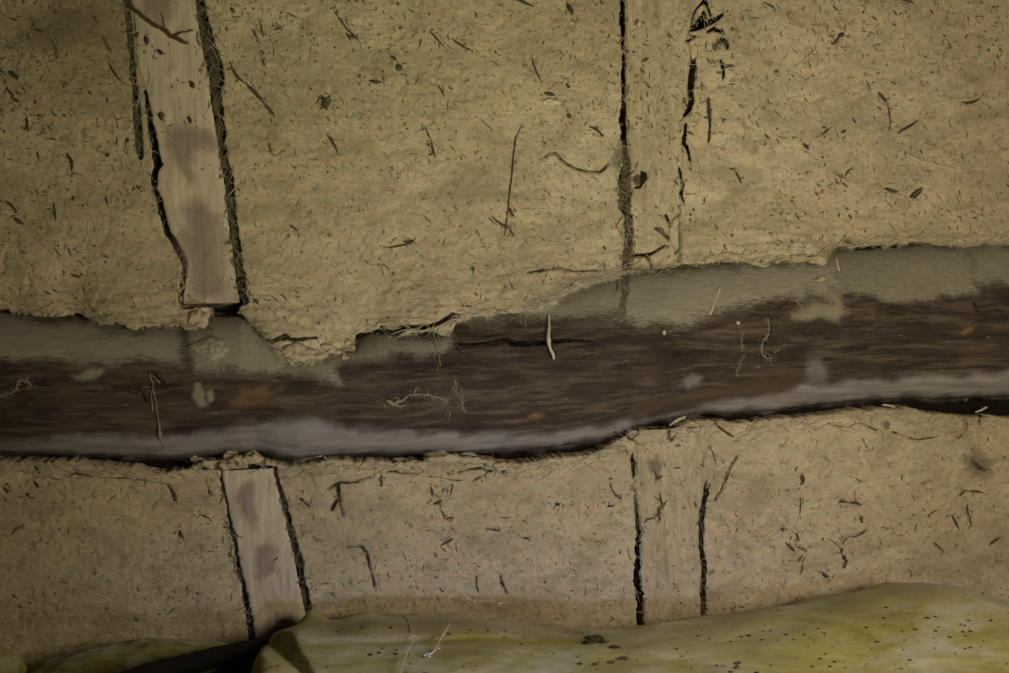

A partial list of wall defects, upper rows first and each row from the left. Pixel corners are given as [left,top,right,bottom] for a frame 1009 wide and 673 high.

peeling [230,62,275,118]
crack [528,0,734,321]
crack [145,91,189,302]
peeling [884,187,923,198]
spalling [722,251,828,282]
spalling [263,332,356,367]
spalling [381,314,459,338]
spalling [632,428,669,446]
crack [624,449,647,625]
crack [697,455,739,615]